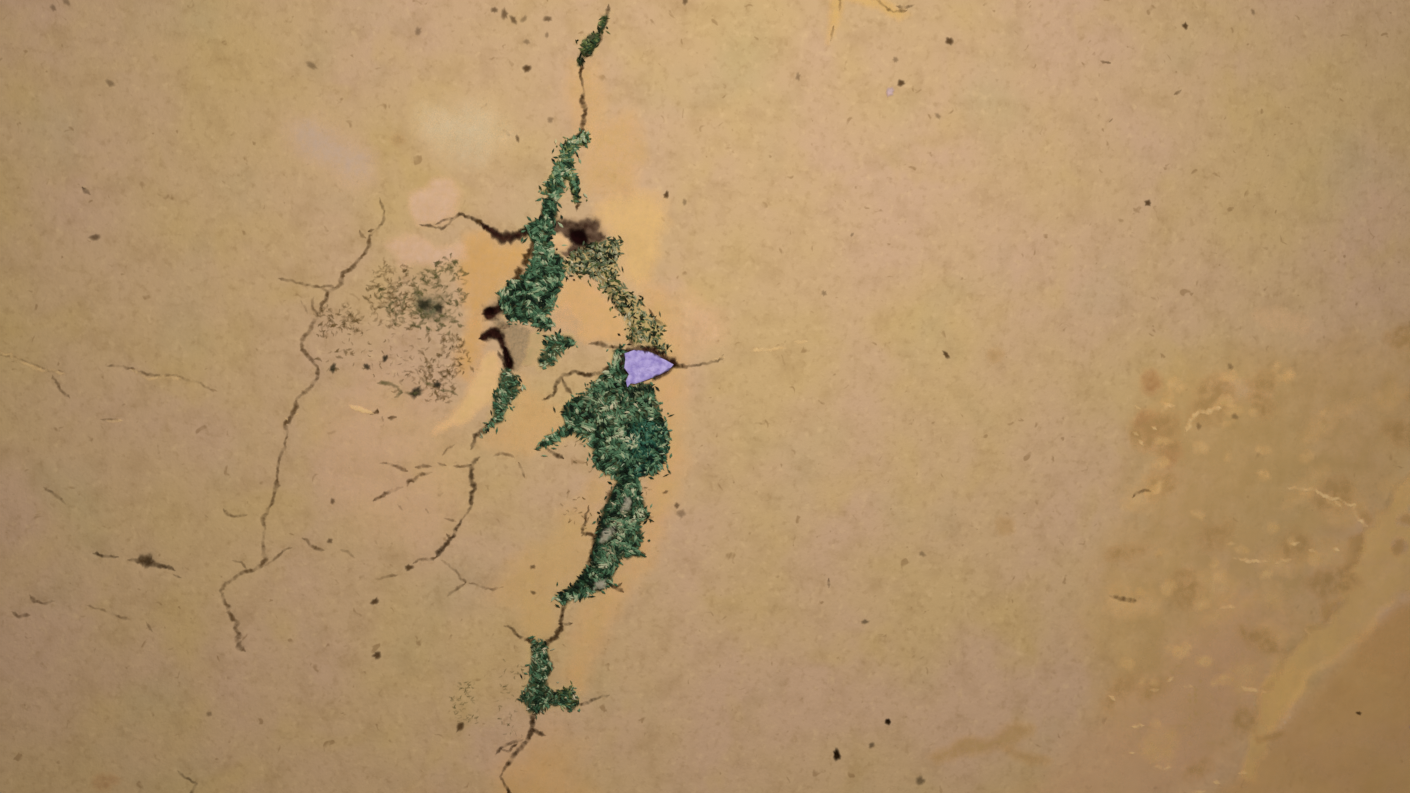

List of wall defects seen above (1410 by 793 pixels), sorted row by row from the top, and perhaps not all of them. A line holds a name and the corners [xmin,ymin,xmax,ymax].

crack [579,9,609,134]
crack [284,230,371,425]
mould [364,253,469,397]
peeling [442,306,545,427]
crack [427,191,660,399]
spalling [551,219,605,256]
peeling [620,346,677,387]
crack [244,470,278,572]
crack [432,431,482,559]
crack [511,489,624,675]
crack [498,711,543,793]